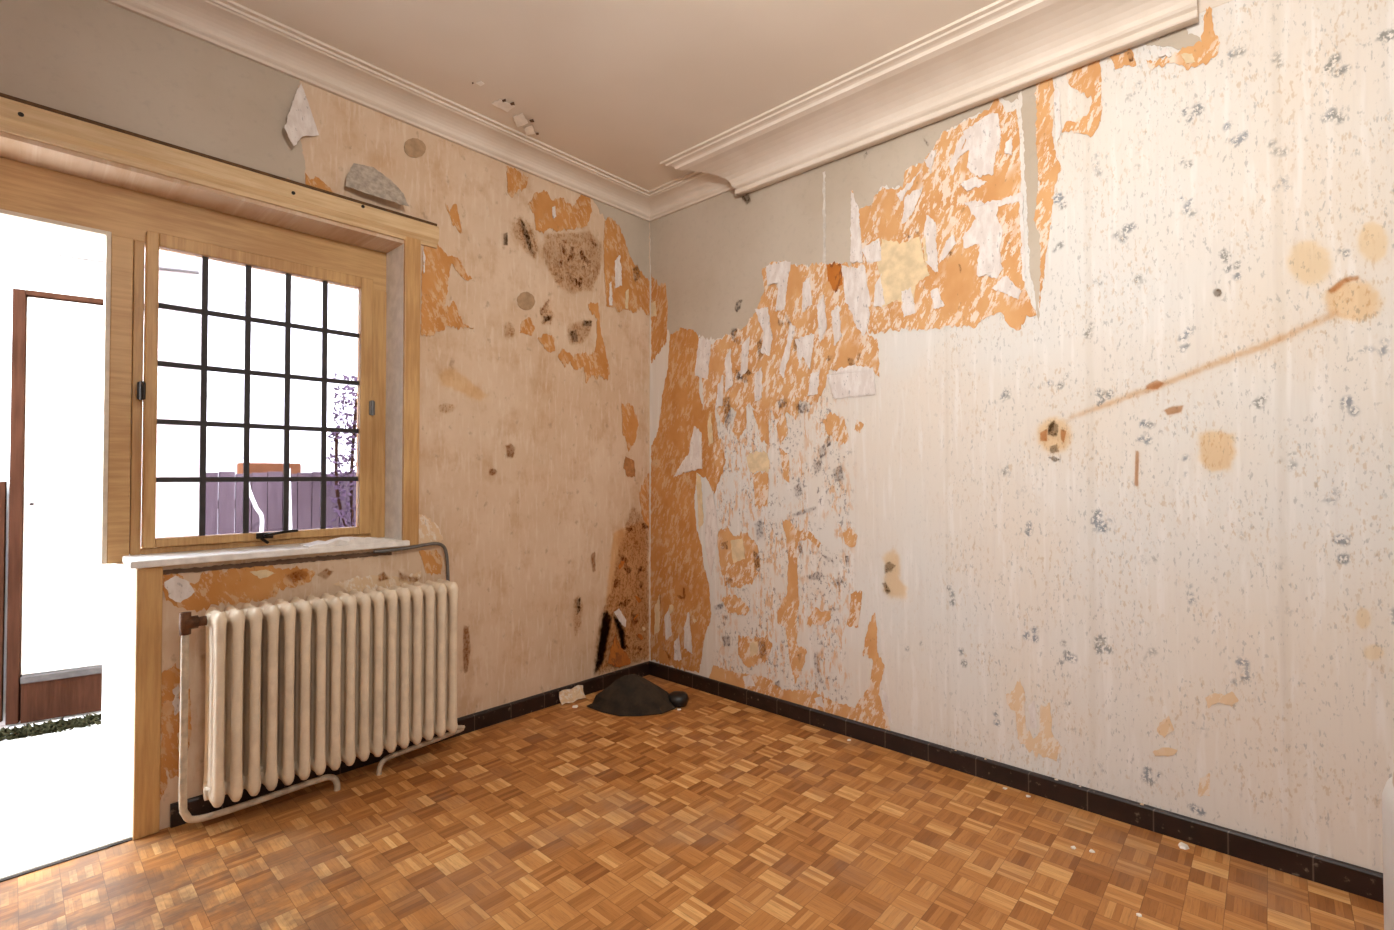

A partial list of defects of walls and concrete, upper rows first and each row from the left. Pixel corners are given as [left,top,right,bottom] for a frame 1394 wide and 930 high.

flaking render [1146,28,1202,64]
peeling [1054,87,1062,147]
flaking render [593,84,1041,576]
peeling [163,565,315,612]
peeling [334,549,443,593]
peeling [654,594,697,661]